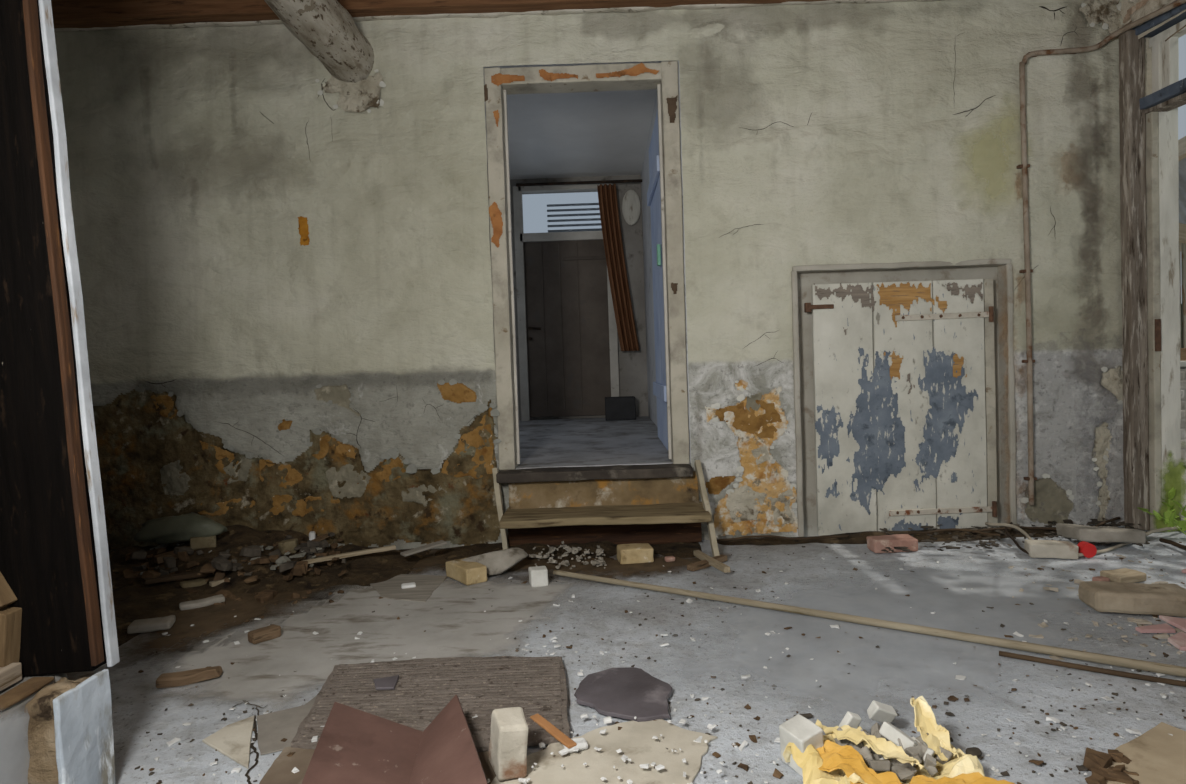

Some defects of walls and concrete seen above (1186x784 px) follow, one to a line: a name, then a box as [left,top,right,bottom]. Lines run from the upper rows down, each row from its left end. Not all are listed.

spalling [1079,0,1148,35]
peeling [539,69,578,81]
peeling [596,62,659,78]
peeling [484,73,525,127]
peeling [489,202,503,248]
peeling [814,282,983,327]
peeling [815,347,978,515]
flaking render [93,379,501,551]
flaking render [705,379,798,537]
peeling [892,513,963,531]
crack [232,700,266,784]